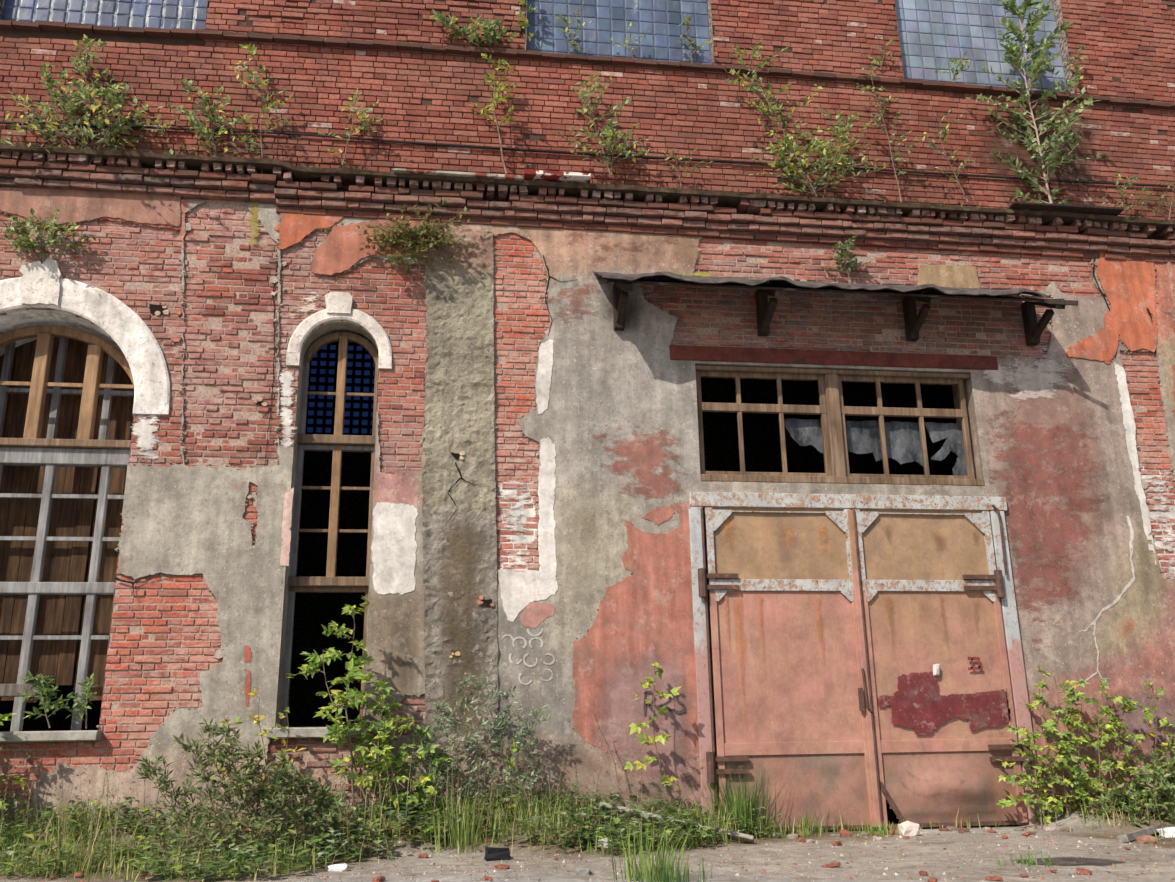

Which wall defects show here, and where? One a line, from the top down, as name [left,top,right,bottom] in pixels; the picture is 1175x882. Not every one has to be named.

spalling [0,513,226,803]
peeling [0,187,432,546]
peeling [244,646,252,706]
crack [447,462,481,524]
peeling [519,602,555,628]
spalling [493,234,594,576]
peeling [572,431,699,759]
spalling [638,237,1175,580]
peeling [990,412,1105,611]
crack [1056,516,1135,692]